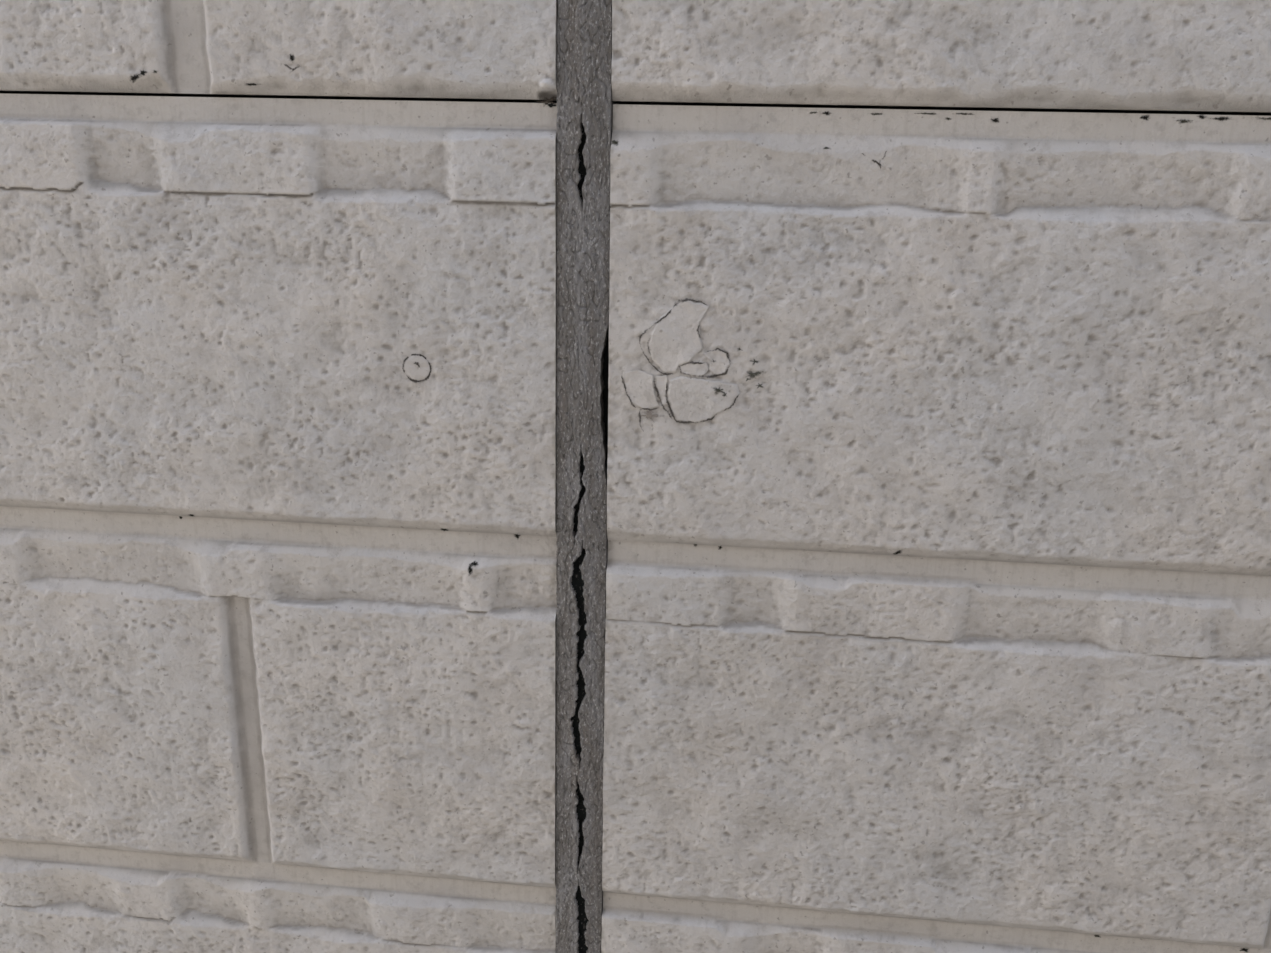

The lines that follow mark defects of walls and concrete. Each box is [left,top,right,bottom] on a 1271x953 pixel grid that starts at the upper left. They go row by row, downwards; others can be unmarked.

crack [577,125,586,198]
peeling [621,298,764,427]
crack [571,455,589,953]